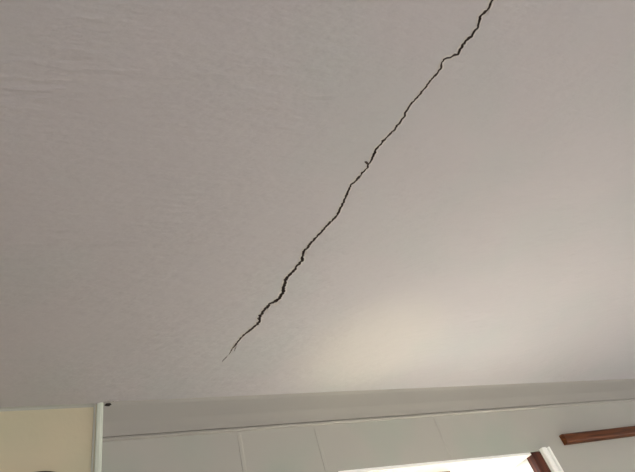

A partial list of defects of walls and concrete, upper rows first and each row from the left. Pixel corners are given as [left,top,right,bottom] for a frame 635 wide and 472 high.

crack [227,0,495,356]